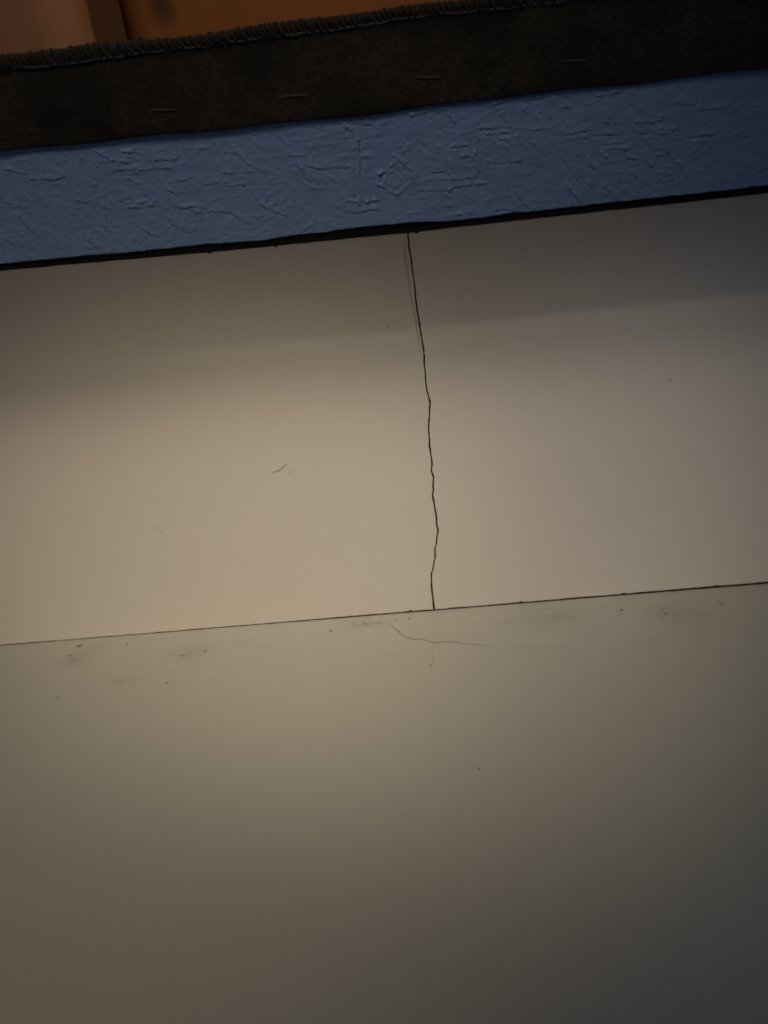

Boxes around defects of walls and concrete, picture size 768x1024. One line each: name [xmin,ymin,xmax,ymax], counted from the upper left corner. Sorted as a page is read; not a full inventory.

crack [0,233,768,646]